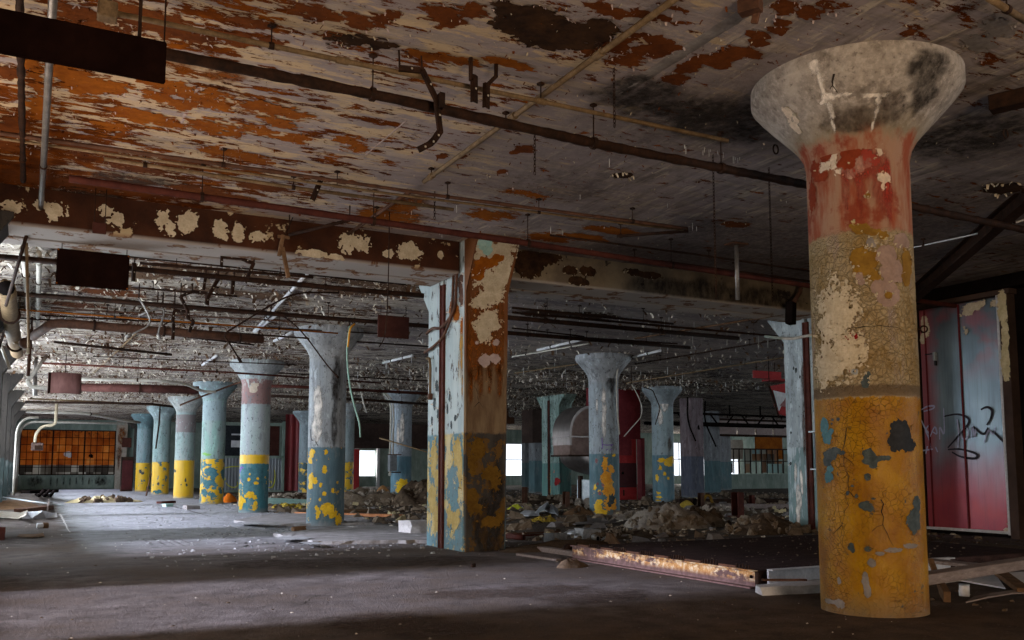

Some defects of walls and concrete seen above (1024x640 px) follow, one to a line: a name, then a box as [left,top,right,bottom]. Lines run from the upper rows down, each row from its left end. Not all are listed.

peeling [0,59,413,217]
peeling [433,131,645,290]
peeling [795,148,891,214]
leakage [809,50,946,132]
peeling [446,301,480,334]
peeling [812,219,913,393]
peeling [201,468,219,495]
peeling [240,463,264,493]
peeling [820,417,845,483]
crack [833,428,893,558]
peeling [844,417,917,512]
peeling [847,495,921,598]